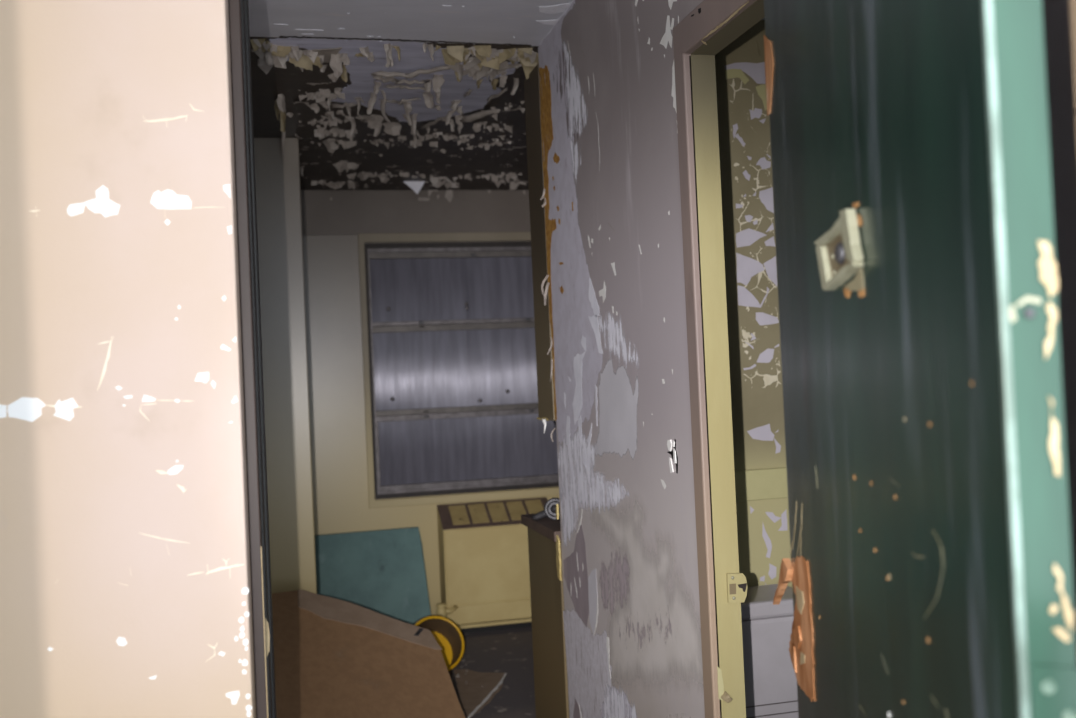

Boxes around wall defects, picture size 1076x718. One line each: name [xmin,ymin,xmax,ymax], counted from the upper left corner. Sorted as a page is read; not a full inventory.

peeling [725,41,767,123]
spalling [67,185,120,217]
spalling [150,189,219,225]
peeling [731,124,780,370]
spalling [1009,240,1059,360]
spalling [250,0,703,718]
spalling [115,386,189,419]
peeling [747,424,781,454]
spalling [1048,396,1060,476]
peeling [750,506,787,585]
spalling [1049,563,1074,642]